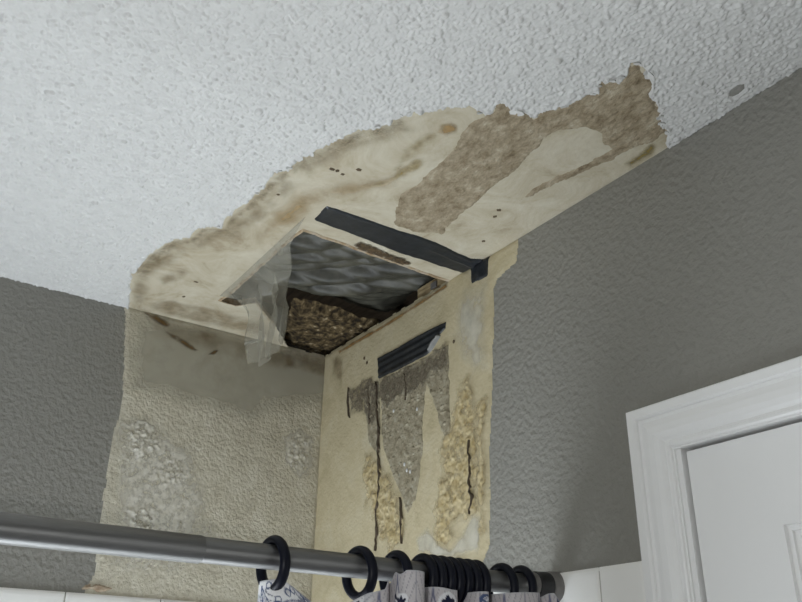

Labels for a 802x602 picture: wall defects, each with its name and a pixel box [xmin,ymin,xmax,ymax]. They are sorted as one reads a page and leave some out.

peeling [100,62,670,562]
crack [346,381,381,551]
crack [466,440,474,514]
crack [397,497,405,544]
peeling [82,554,259,602]
peeling [287,572,380,602]